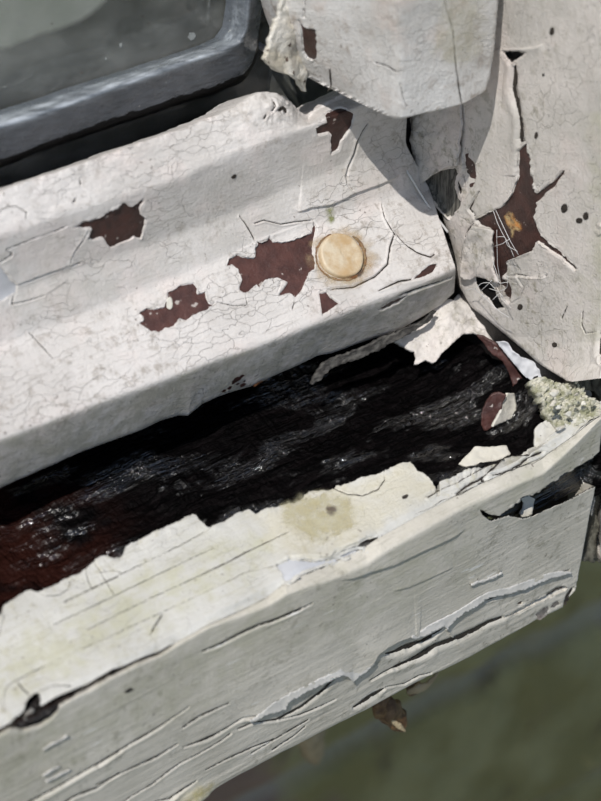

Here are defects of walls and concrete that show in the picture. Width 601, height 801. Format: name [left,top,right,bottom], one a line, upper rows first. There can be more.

crack [264,102,287,119]
peeling [314,105,356,155]
peeling [72,199,147,250]
peeling [226,221,318,301]
rust [315,234,370,282]
crack [329,209,447,293]
peeling [459,132,577,310]
peeling [138,282,216,334]
peeling [394,294,541,380]
crack [0,532,288,730]
crack [353,616,502,707]
crack [30,679,335,801]